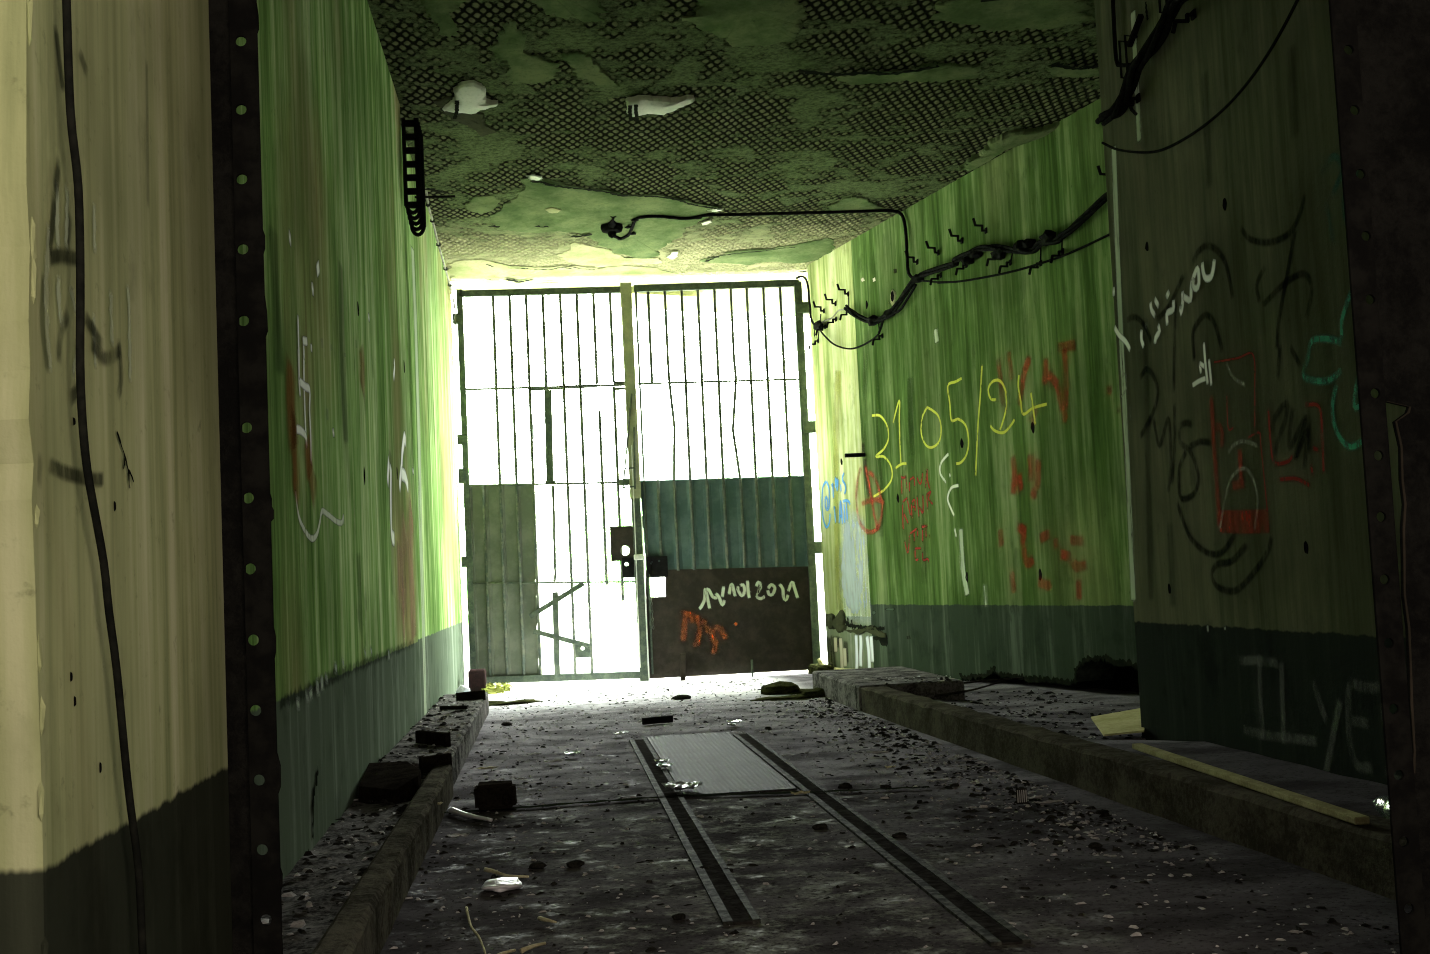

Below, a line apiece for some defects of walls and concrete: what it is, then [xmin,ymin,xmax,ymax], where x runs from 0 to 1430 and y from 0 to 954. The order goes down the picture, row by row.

flaking render [420,0,469,38]
flaking render [527,0,610,22]
flaking render [682,0,809,48]
flaking render [929,0,1095,33]
flaking render [488,20,695,121]
flaking render [836,62,983,85]
flaking render [1045,65,1099,78]
flaking render [433,80,498,137]
flaking render [448,174,724,291]
flaking render [700,237,836,265]